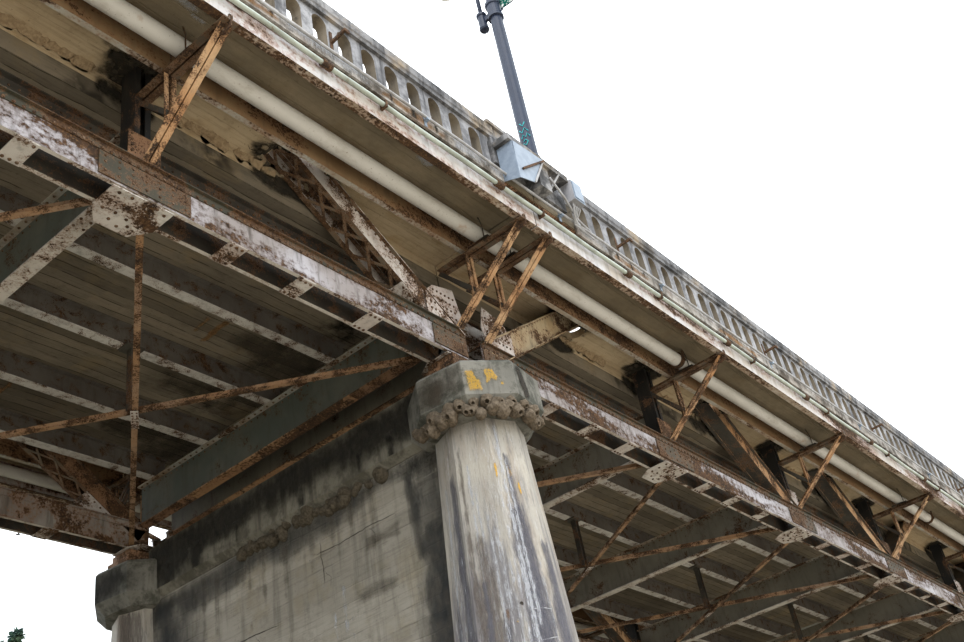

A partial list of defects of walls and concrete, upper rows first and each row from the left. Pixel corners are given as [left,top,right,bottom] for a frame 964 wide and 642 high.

damp [104,418,184,457]
damp [119,488,370,642]
damp [149,372,455,588]
damp [394,425,573,642]
damp [515,367,530,398]